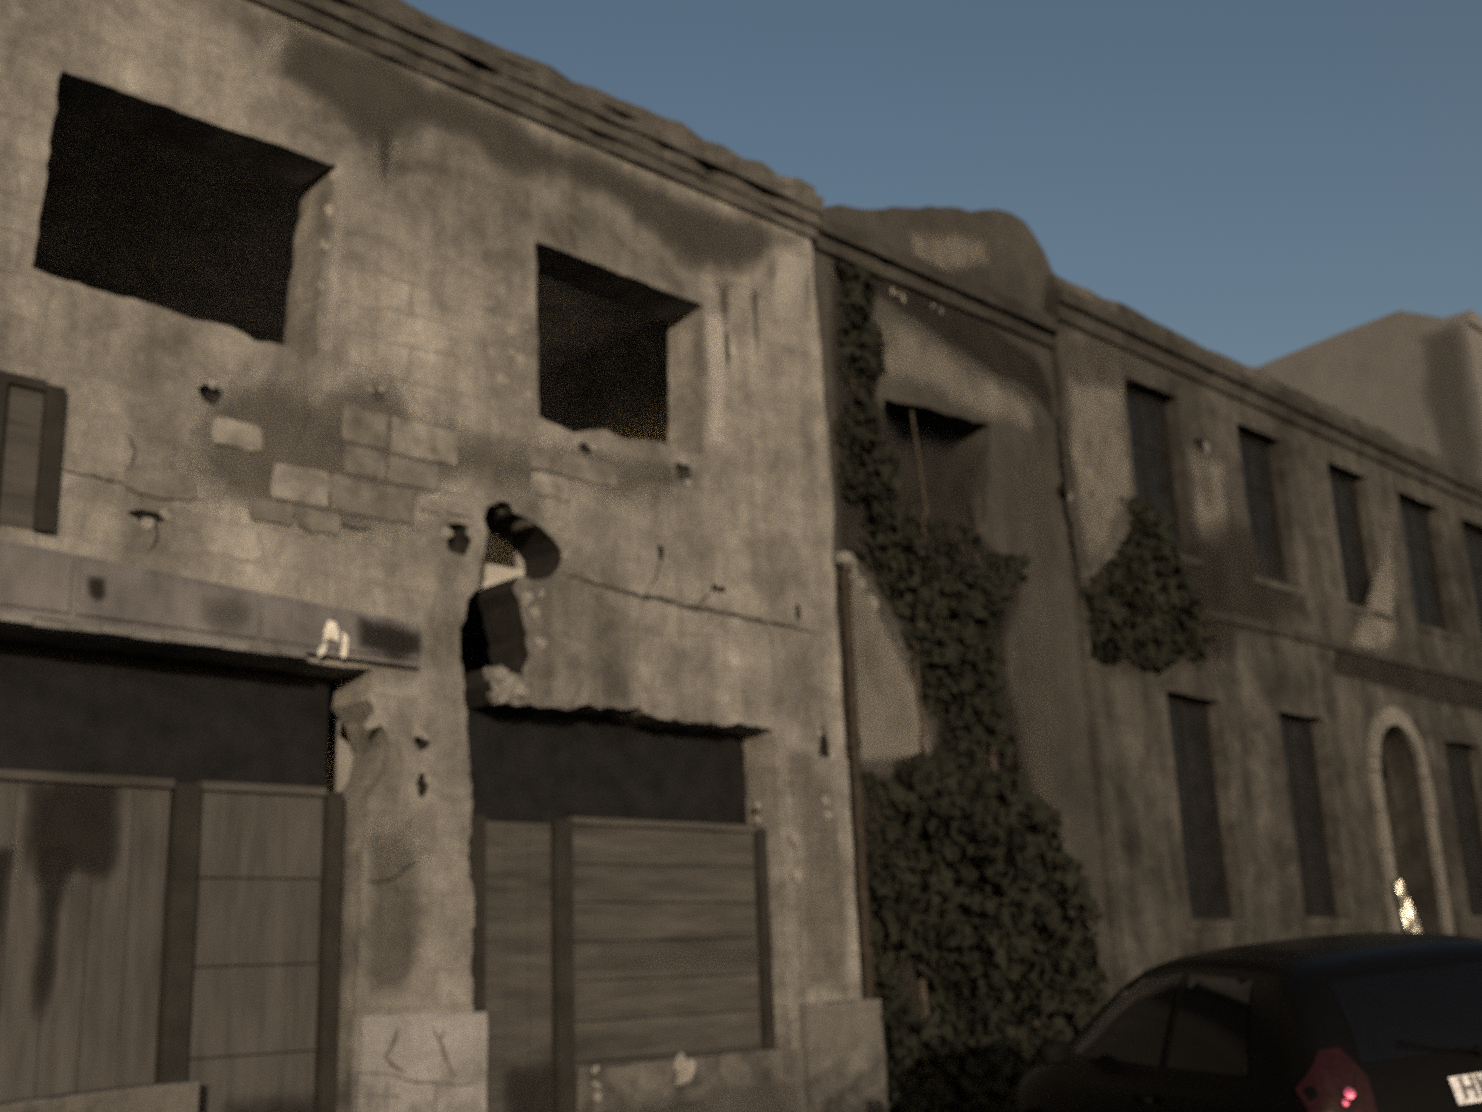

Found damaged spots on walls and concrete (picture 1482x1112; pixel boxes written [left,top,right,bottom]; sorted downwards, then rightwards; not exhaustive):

spalling [128,508,173,530]
crack [561,561,817,648]